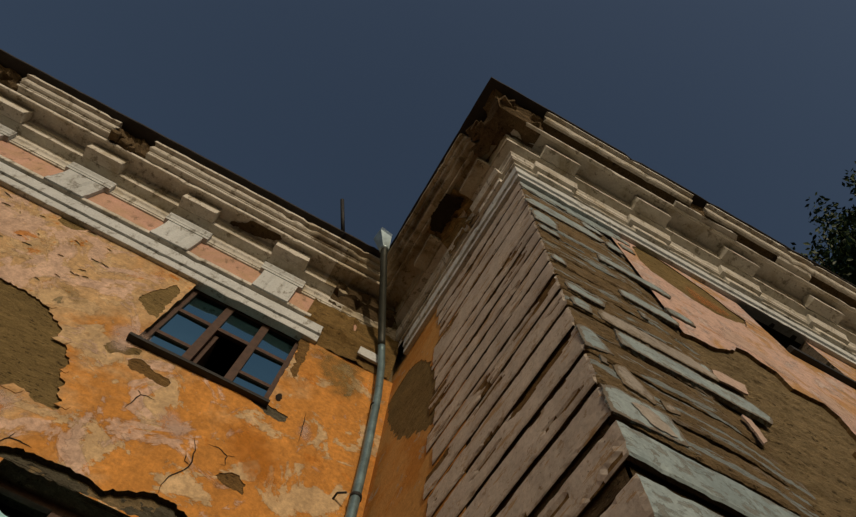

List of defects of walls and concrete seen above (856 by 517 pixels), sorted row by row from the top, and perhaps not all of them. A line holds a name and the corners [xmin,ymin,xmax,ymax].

spalling [230,221,282,241]
spalling [427,189,477,254]
spalling [138,286,180,318]
spalling [0,279,71,410]
spalling [104,341,170,387]
spalling [519,183,856,517]
spalling [0,452,89,496]
crack [158,440,234,493]
spalling [216,473,245,495]